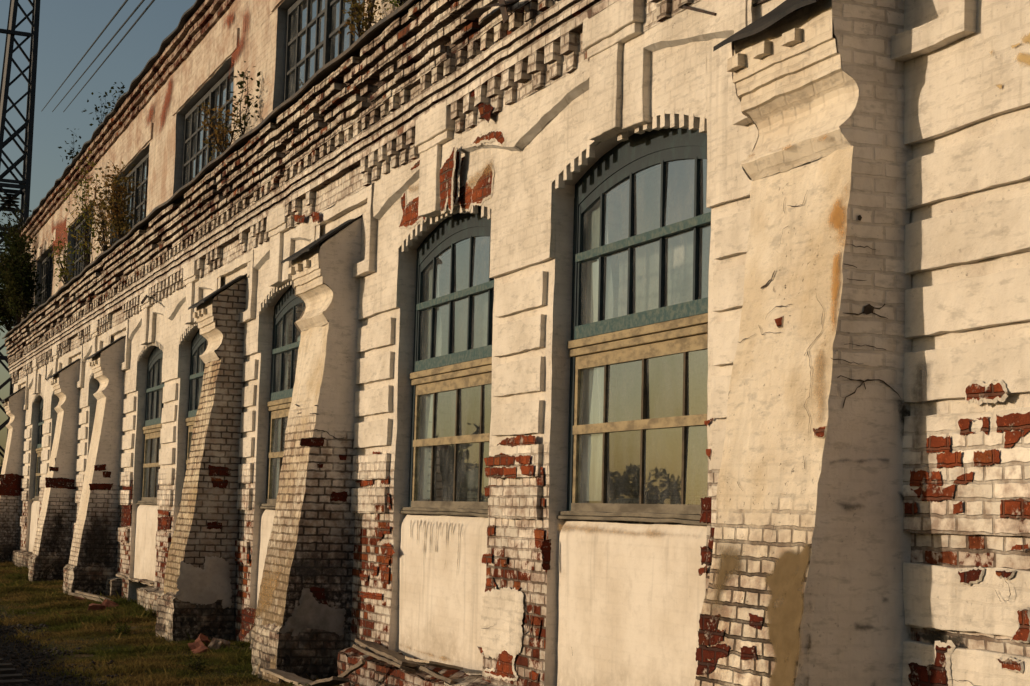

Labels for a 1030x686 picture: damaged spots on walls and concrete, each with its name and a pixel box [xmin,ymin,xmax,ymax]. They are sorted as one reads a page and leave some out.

peeling [399,91,507,230]
crack [739,271,791,343]
crack [804,299,900,423]
flaking render [484,435,545,507]
flaking render [904,379,1030,516]
flaking render [698,497,715,576]
flaking render [1000,498,1030,520]
spalling [958,566,1016,586]
spalling [485,649,539,682]
flaking render [696,614,757,675]
spalling [907,640,956,686]
spalling [1010,607,1030,643]